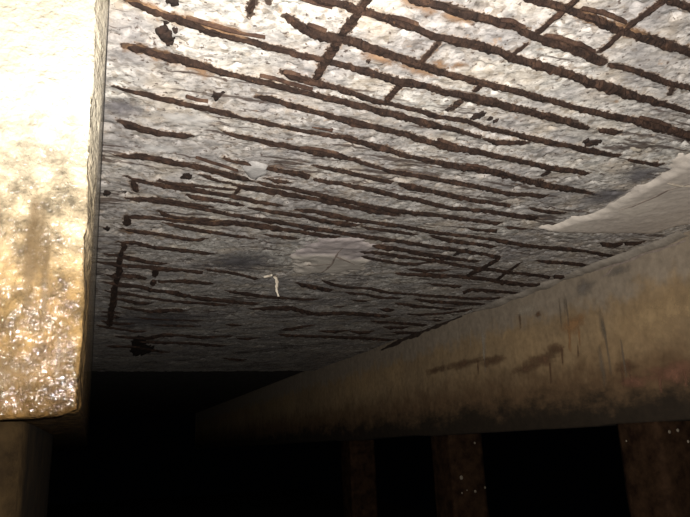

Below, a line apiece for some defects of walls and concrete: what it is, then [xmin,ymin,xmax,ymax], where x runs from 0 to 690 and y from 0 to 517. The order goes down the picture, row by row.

spalling [92,0,690,372]